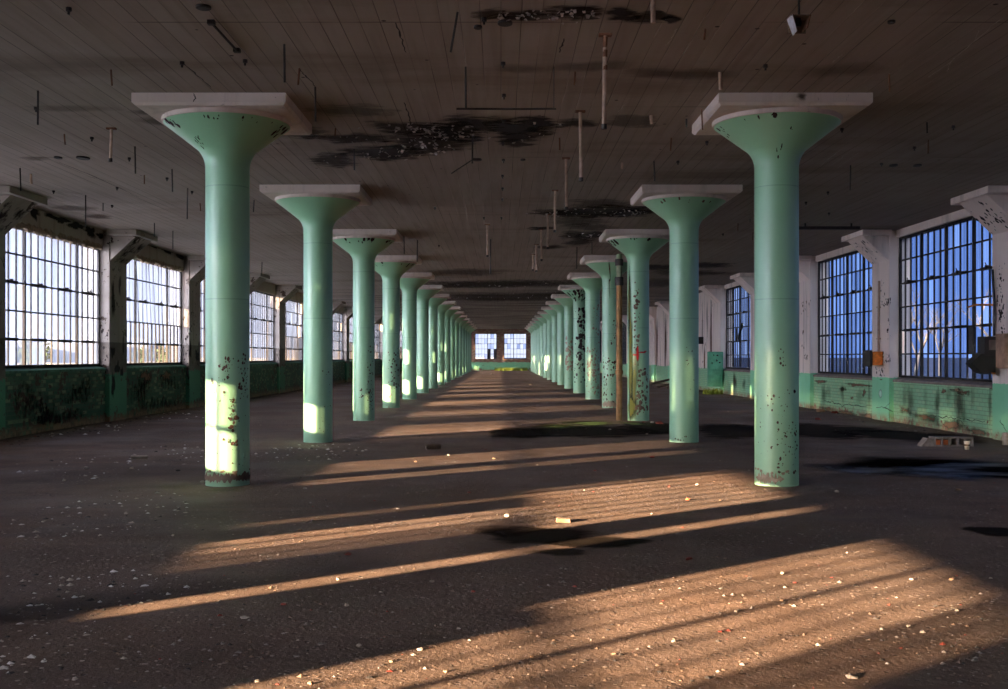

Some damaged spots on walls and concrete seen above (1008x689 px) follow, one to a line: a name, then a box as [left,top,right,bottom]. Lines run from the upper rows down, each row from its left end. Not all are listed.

peeling [975,201,1008,234]
spalling [565,289,616,408]
peeling [211,353,248,450]
peeling [635,364,648,415]
leakage [699,424,754,439]
peeling [755,390,798,484]
leakage [799,423,950,441]